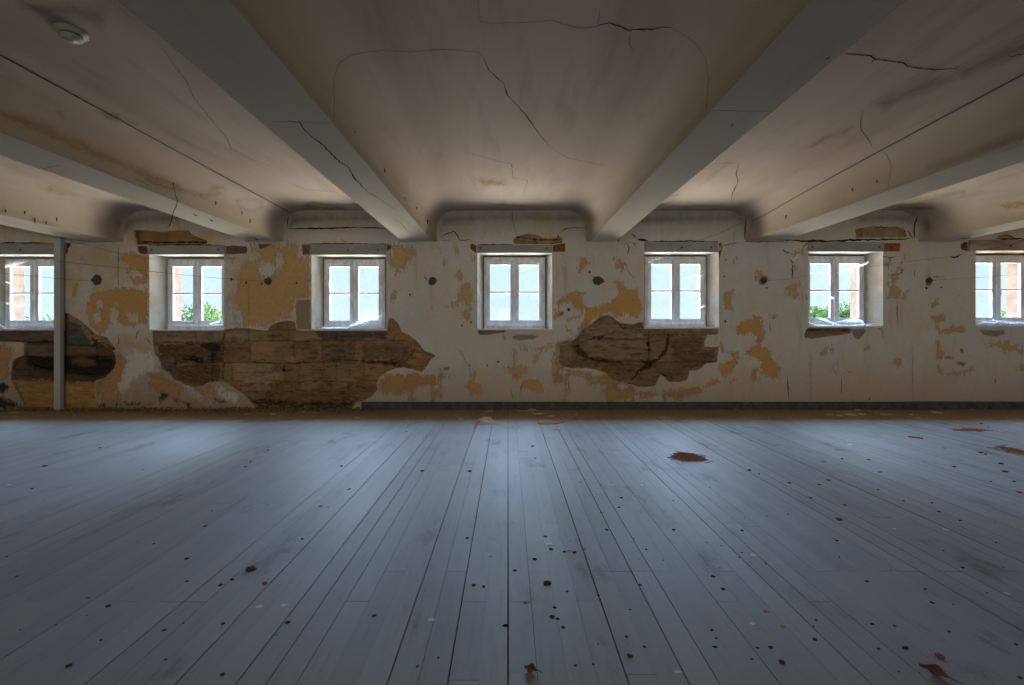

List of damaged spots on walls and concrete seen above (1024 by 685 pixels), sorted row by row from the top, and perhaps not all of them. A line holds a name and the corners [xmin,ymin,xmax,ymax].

crack [479,53,551,148]
crack [598,23,671,32]
crack [844,53,956,70]
crack [288,121,375,196]
flaking render [0,230,435,409]
flaking render [503,257,782,392]